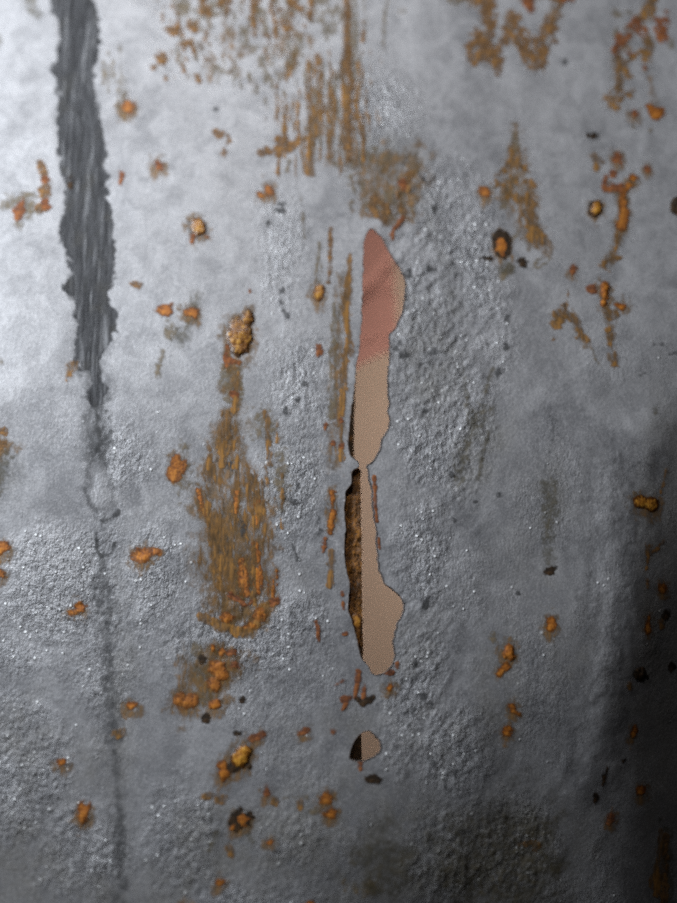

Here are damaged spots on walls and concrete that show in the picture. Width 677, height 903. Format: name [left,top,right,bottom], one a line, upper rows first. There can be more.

corrosion [150,0,423,244]
corrosion [447,0,574,76]
corrosion [603,0,674,128]
corrosion [478,124,552,280]
corrosion [585,151,652,367]
corrosion [307,227,354,466]
corrosion [550,293,596,360]
corrosion [0,540,13,582]
corrosion [166,306,291,723]
peeling [352,613,362,646]
corrosion [201,730,266,804]
corrosion [225,806,255,858]